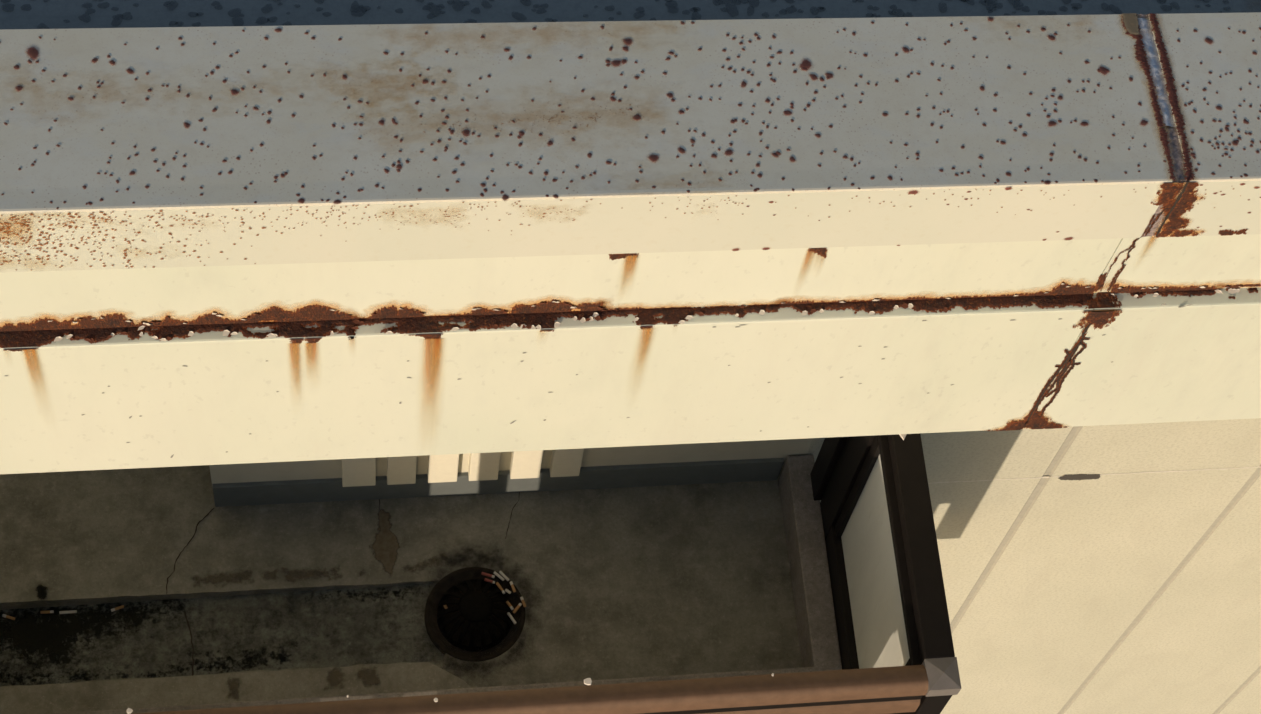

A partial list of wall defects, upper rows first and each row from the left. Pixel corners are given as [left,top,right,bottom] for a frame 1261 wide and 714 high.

corrosion [4,36,67,125]
corrosion [92,55,190,101]
corrosion [205,51,281,124]
corrosion [645,33,919,215]
corrosion [933,144,1069,207]
corrosion [996,13,1261,240]
corrosion [609,253,639,272]
corrosion [805,248,828,265]
crack [1101,182,1189,292]
corrosion [0,274,1261,386]
crack [1025,323,1093,424]
crack [166,508,214,676]